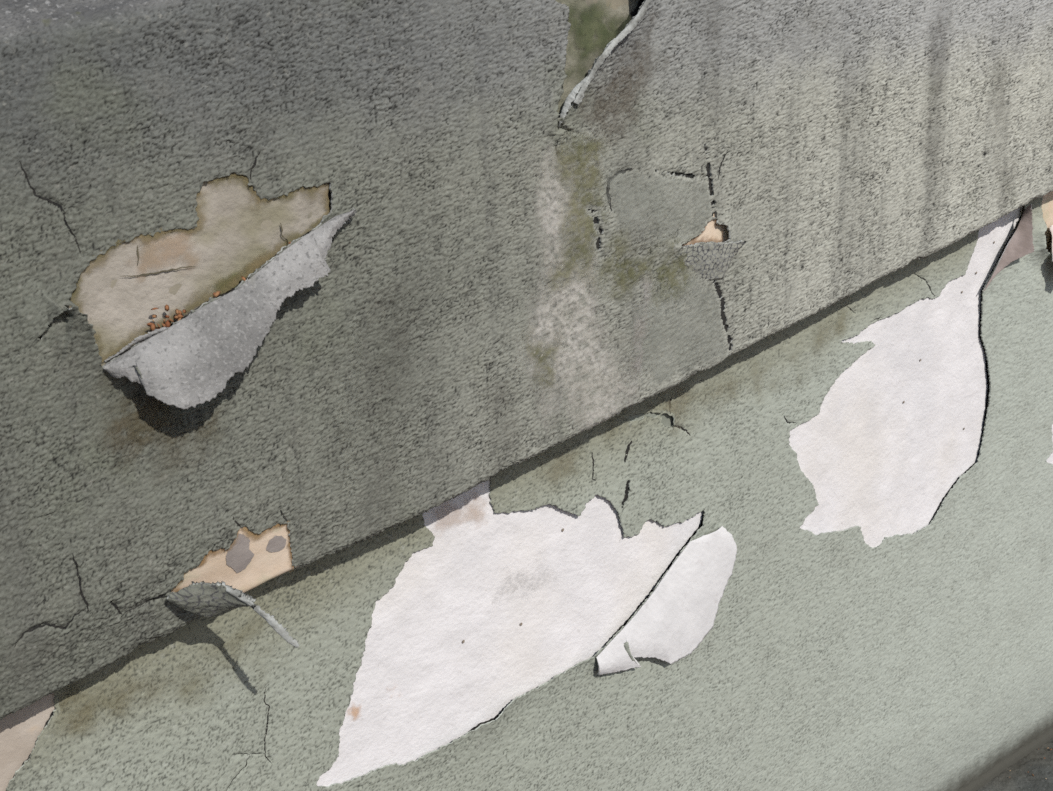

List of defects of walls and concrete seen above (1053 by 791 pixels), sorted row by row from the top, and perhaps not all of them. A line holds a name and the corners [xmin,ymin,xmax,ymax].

peeling [555,0,651,127]
crack [20,161,81,253]
peeling [65,172,357,409]
crack [588,144,728,249]
peeling [673,212,747,280]
crack [713,280,731,351]
peeling [789,191,1053,548]
crack [15,553,173,646]
peeling [167,521,300,648]
peeling [316,479,737,787]
peeling [0,693,56,791]